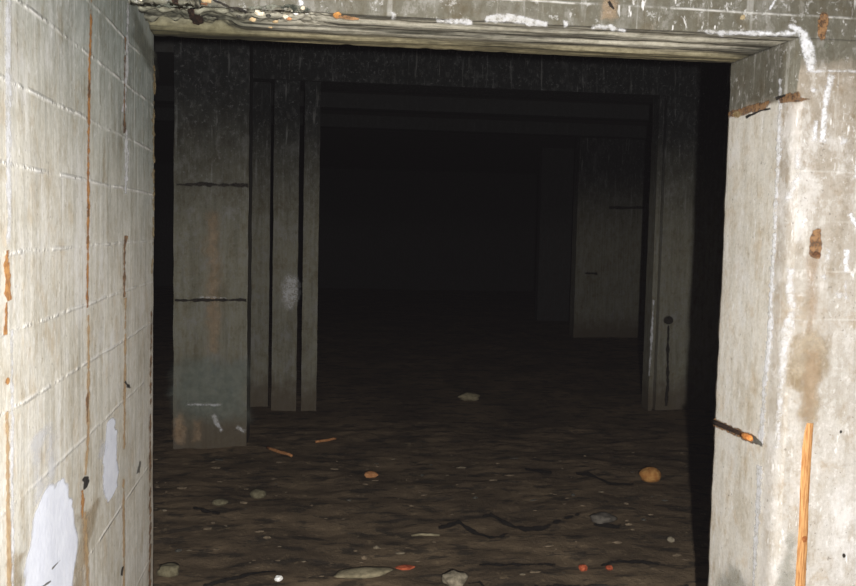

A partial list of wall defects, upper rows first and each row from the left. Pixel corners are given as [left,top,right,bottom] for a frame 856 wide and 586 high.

spalling [122,0,310,114]
corrosion [809,229,822,259]
corrosion [4,251,12,335]